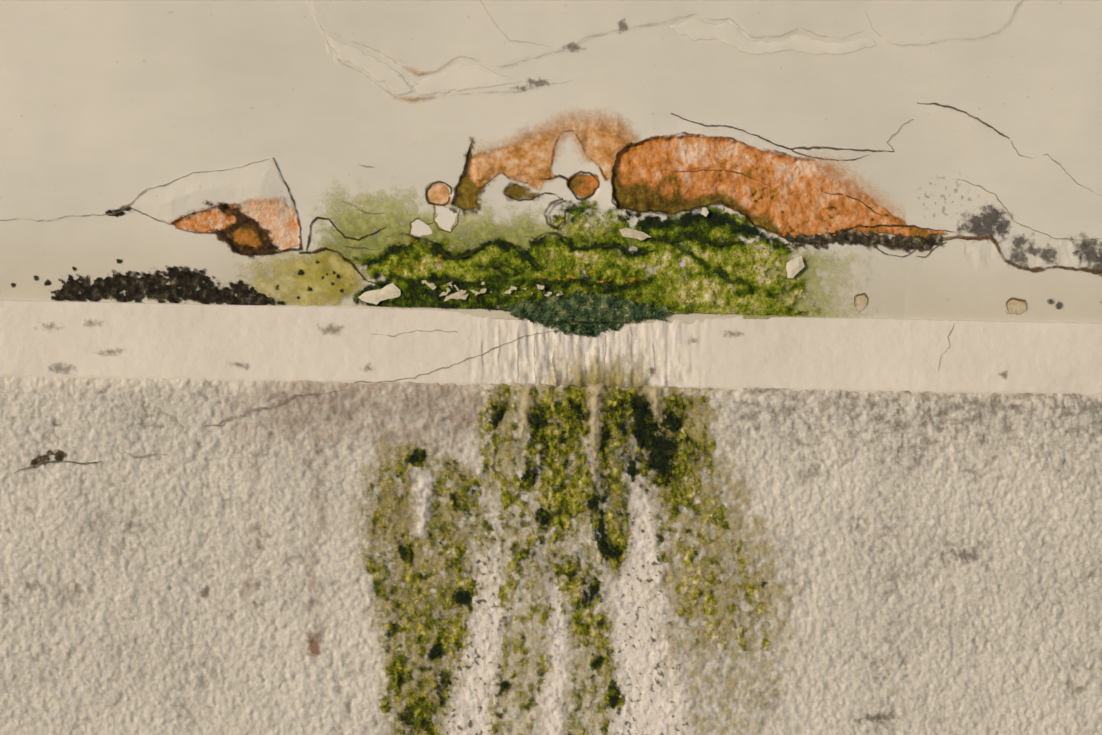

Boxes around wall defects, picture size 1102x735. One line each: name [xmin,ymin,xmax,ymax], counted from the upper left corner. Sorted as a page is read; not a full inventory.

peeling [330,37,548,95]
peeling [669,18,876,55]
crack [671,103,1081,186]
damp [33,259,286,305]
flaking render [105,158,302,258]
damp [957,205,1057,267]
crack [930,235,1102,274]
crack [963,180,1075,240]
damp [410,467,433,537]
damp [436,540,513,735]
damp [535,532,575,735]
damp [605,495,696,735]